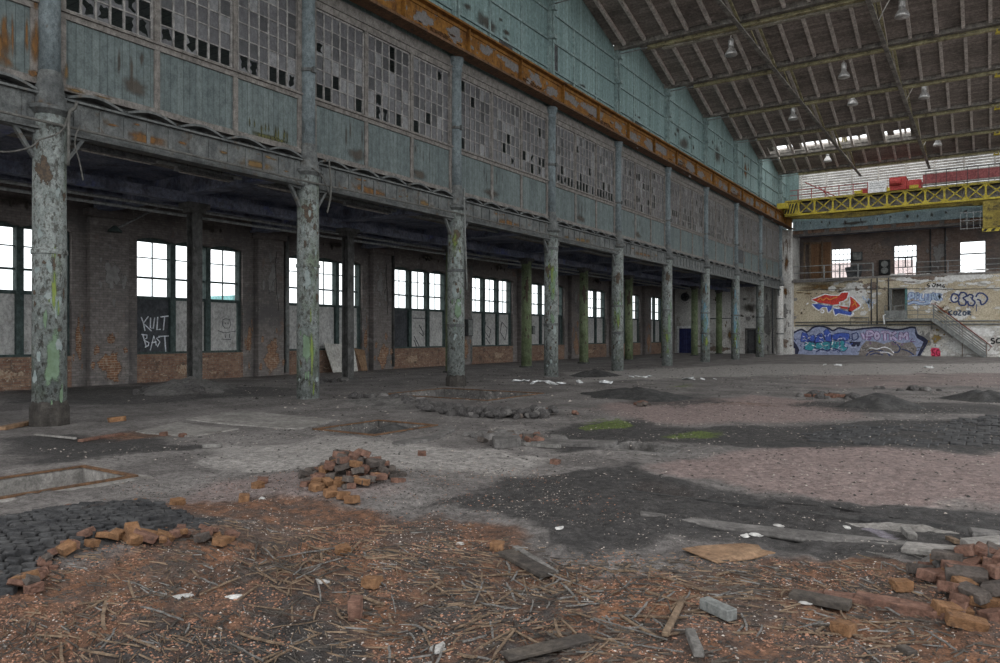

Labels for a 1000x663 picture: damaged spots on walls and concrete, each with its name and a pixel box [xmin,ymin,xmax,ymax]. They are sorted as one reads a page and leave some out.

rust [0,18,39,77]
peeling [34,139,66,201]
peeling [302,199,318,302]